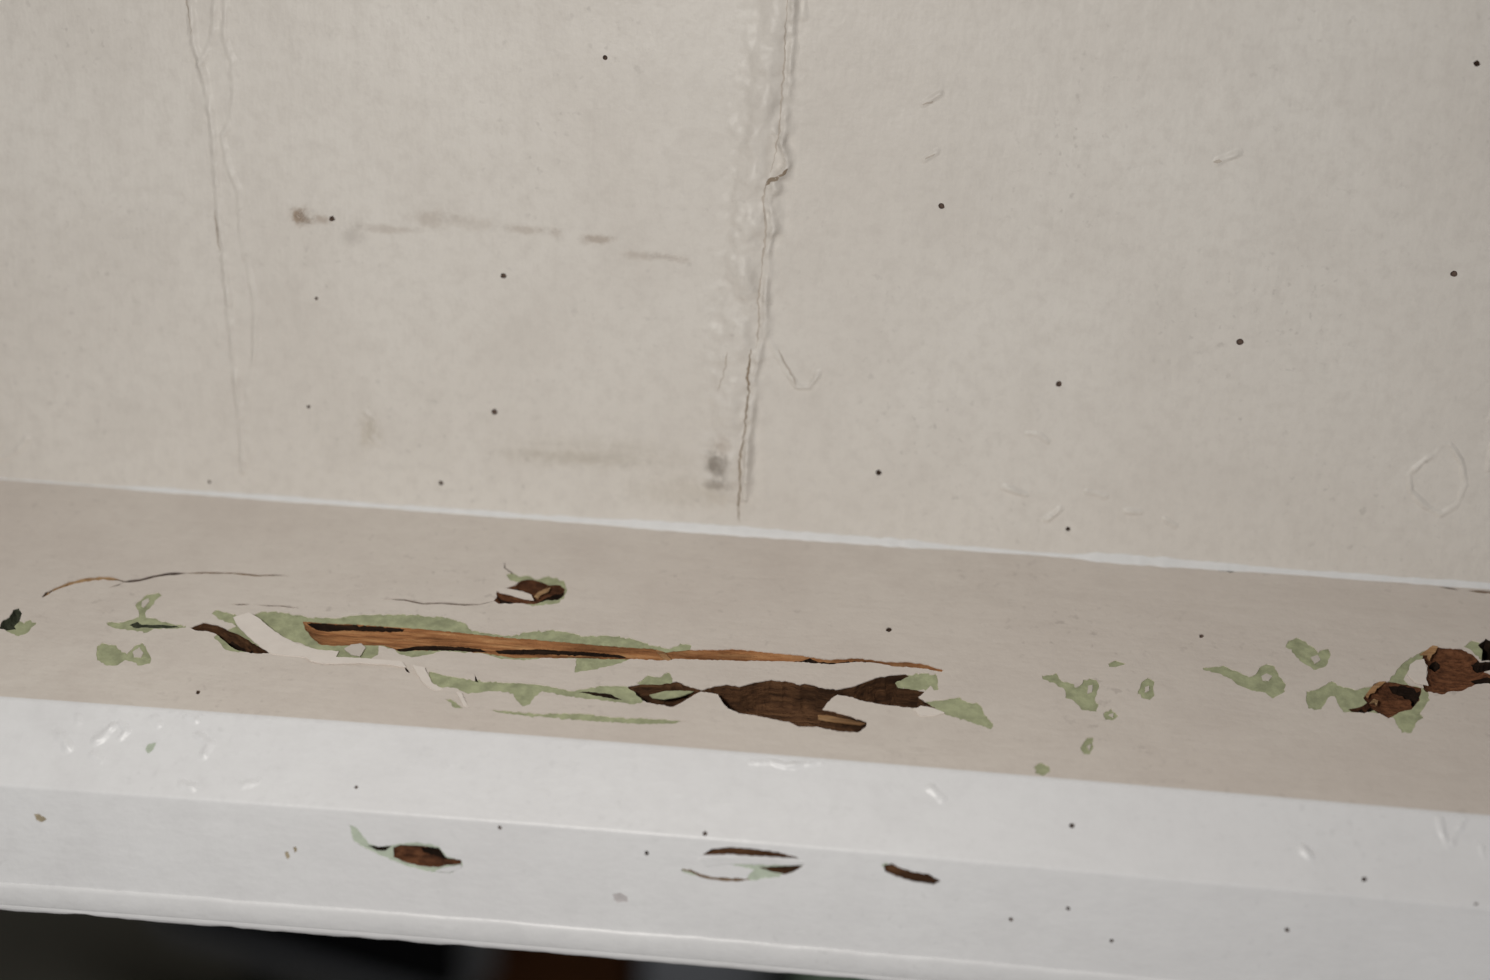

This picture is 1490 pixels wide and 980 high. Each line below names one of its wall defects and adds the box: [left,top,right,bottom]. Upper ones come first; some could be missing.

crack [685,0,823,522]
spalling [495,573,567,606]
peeling [0,609,36,636]
peeling [96,593,693,724]
peeling [914,706,944,717]
peeling [1042,674,1118,720]
peeling [1138,678,1154,700]
peeling [1203,665,1286,698]
peeling [1286,638,1330,670]
peeling [1407,659,1428,686]
peeling [435,864,462,873]
peeling [682,847,803,881]